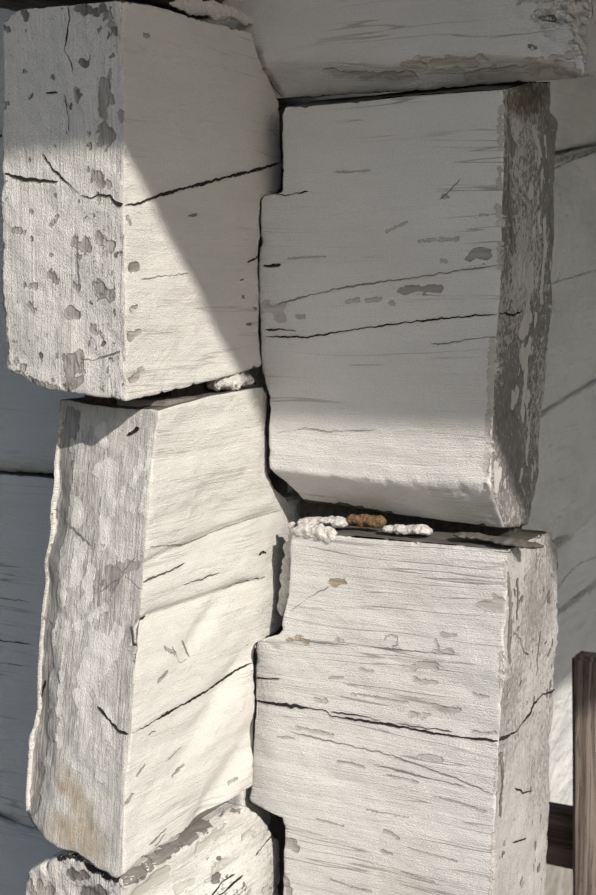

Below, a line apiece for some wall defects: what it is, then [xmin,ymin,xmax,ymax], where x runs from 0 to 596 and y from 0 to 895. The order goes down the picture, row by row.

peeling [87,52,126,152]
crack [4,153,280,206]
peeling [71,230,123,260]
peeling [2,271,106,392]
peeling [90,278,116,316]
crack [275,265,495,305]
crack [265,310,522,338]
peeling [92,421,152,551]
crack [97,663,279,736]
crack [257,689,555,742]
crack [290,731,496,795]
peeling [57,808,240,895]